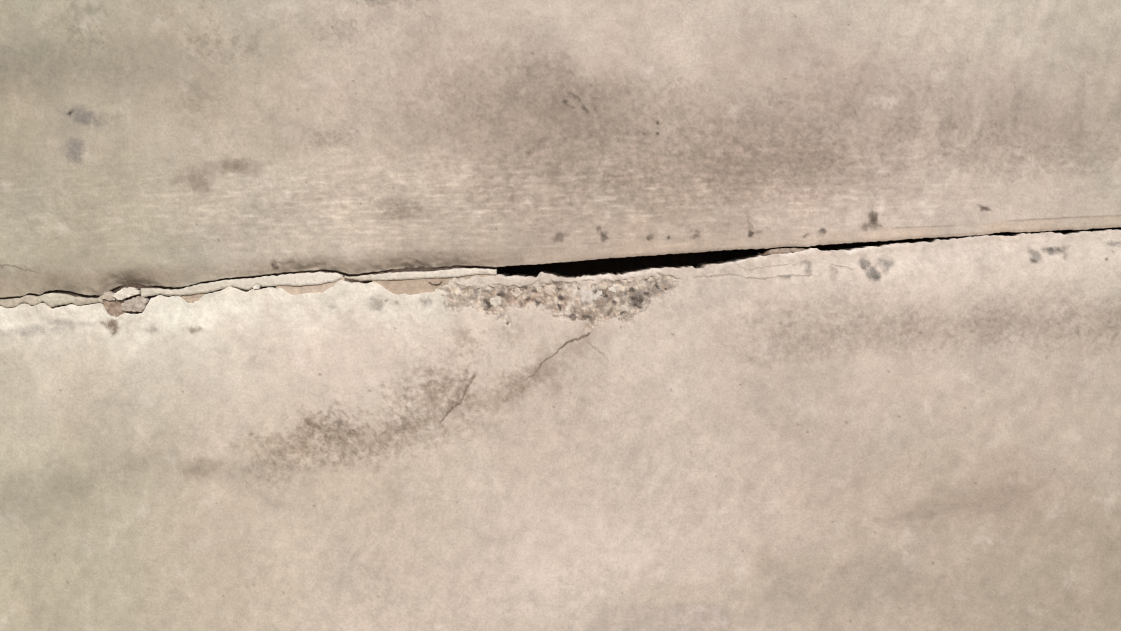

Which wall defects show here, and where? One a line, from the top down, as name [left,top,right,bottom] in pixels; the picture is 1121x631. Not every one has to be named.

crack [973,227,1121,236]
flaking render [0,267,679,334]
crack [0,237,941,313]